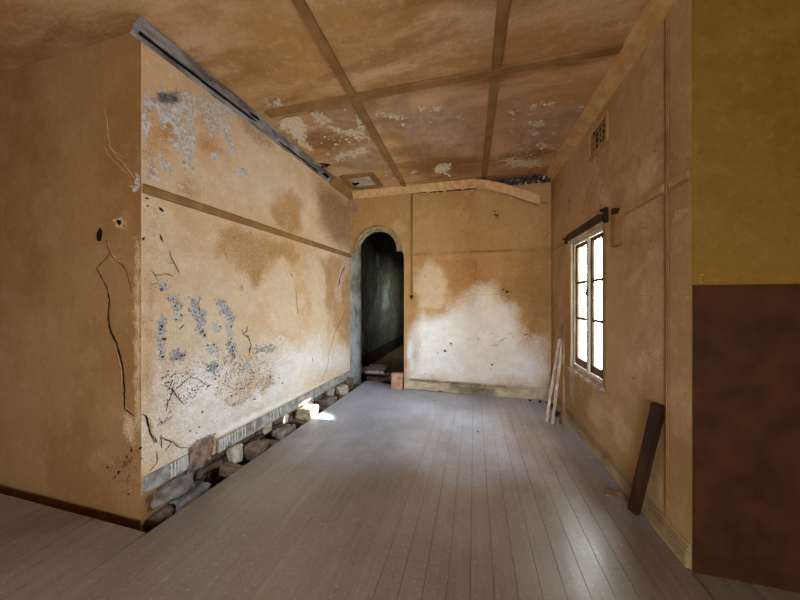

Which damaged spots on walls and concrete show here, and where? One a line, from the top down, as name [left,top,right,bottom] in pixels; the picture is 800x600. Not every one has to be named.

crack [104,107,136,181]
peeling [132,31,259,196]
peeling [275,109,370,179]
flaking render [489,101,560,199]
crack [96,241,203,472]
leakage [104,178,365,498]
leakage [404,243,551,396]
flaking render [187,433,216,473]